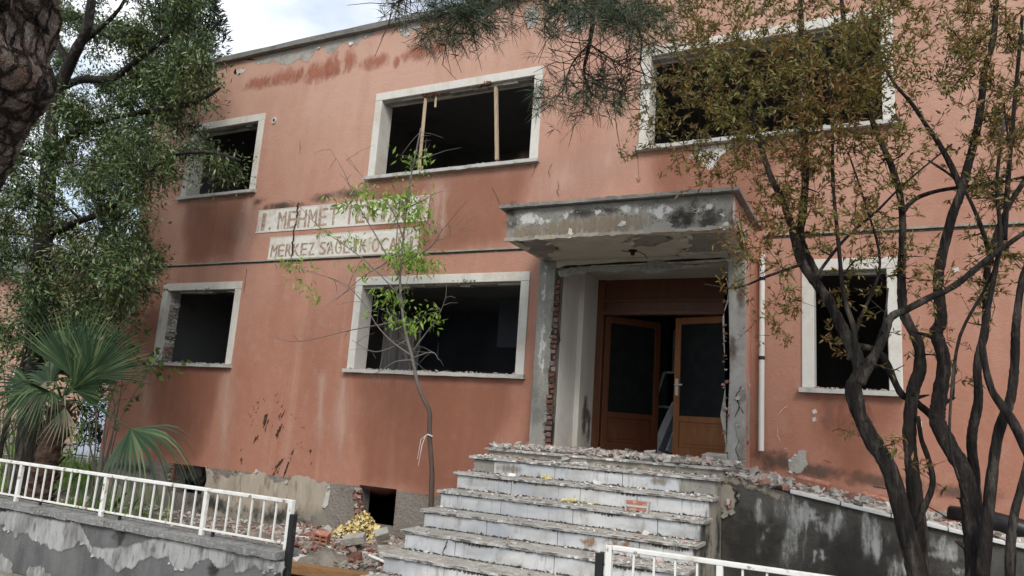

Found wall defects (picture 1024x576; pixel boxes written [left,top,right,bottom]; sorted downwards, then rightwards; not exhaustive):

flaking render [233,29,385,75]
peeling [622,196,747,257]
spalling [543,276,561,445]
leakage [235,395,303,473]
flaking render [95,463,176,509]
flaking render [200,466,330,526]
peeling [26,566,51,576]
peeling [0,511,285,574]